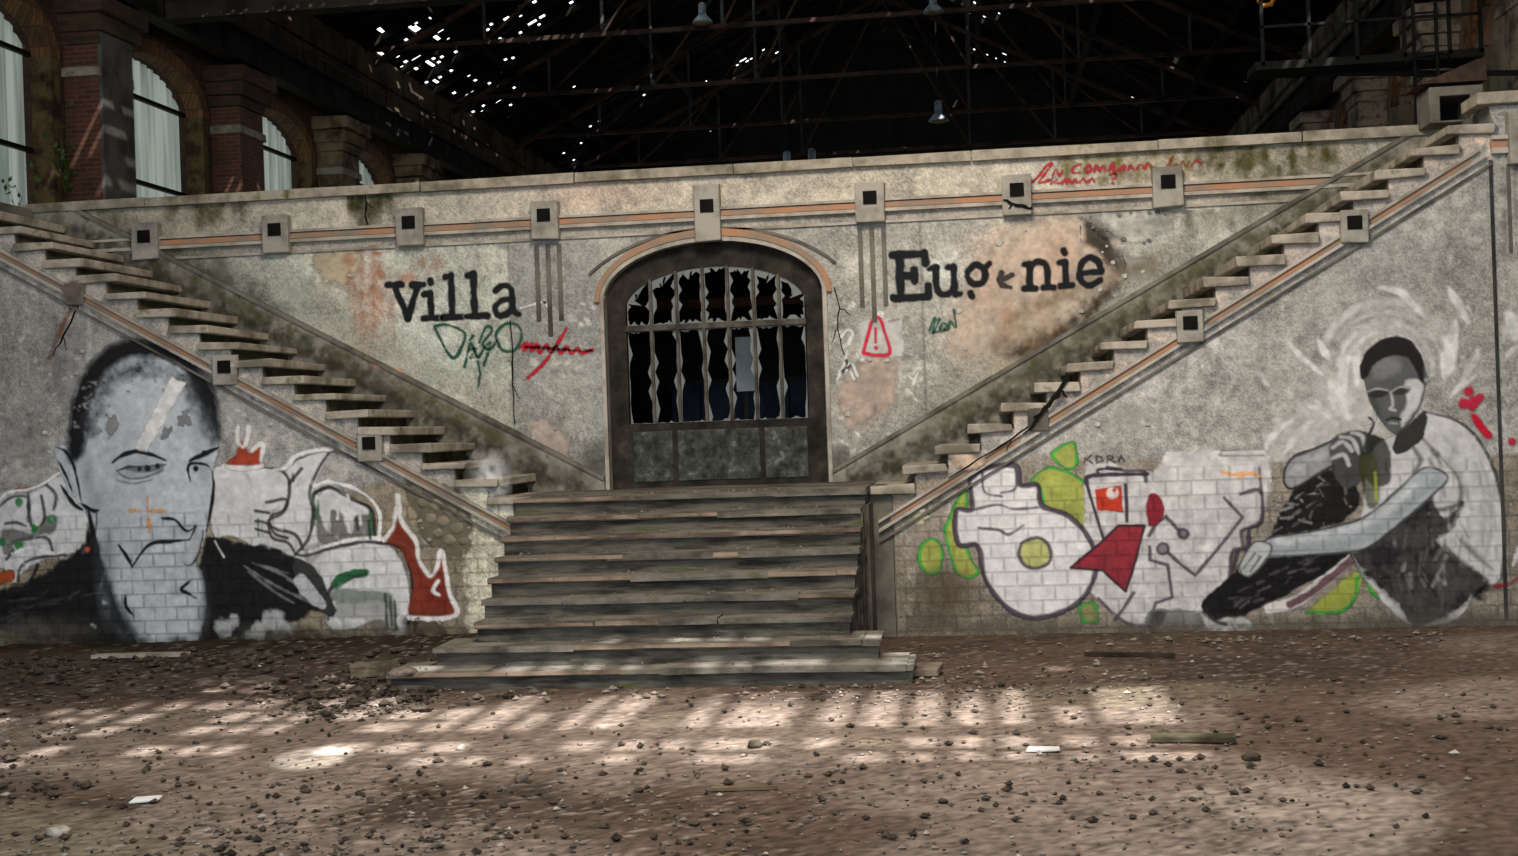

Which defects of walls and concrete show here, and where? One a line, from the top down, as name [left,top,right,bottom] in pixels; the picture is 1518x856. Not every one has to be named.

flaking render [310,250,360,287]
flaking render [950,208,1173,352]